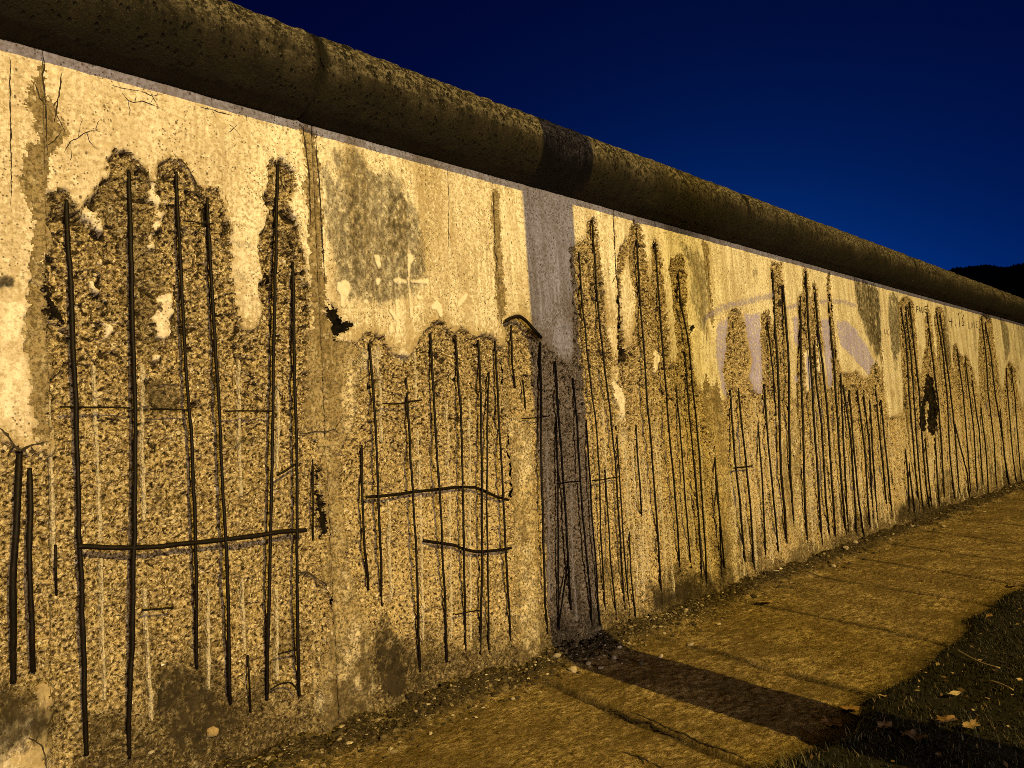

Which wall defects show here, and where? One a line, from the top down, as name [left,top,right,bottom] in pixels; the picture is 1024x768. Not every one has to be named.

spalling [0,62,709,768]
water stain [326,153,423,300]
peeling [701,239,715,332]
spalling [677,261,1024,594]